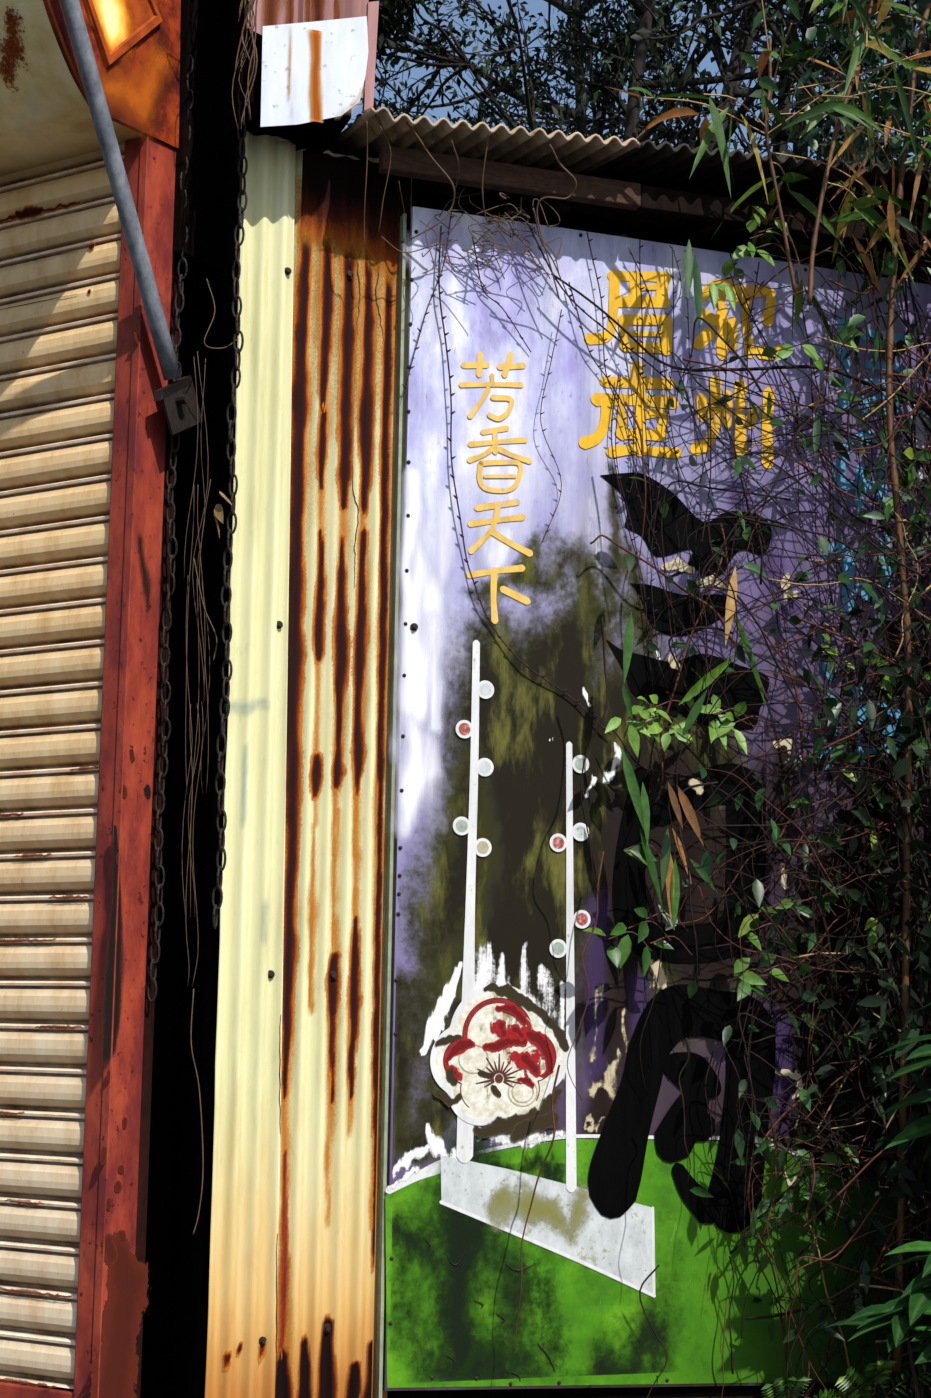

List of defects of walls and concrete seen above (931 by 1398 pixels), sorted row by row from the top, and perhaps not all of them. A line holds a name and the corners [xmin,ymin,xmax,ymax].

corrosion [0,6,28,93]
corrosion [102,51,169,120]
corrosion [263,0,340,123]
corrosion [222,150,411,1398]